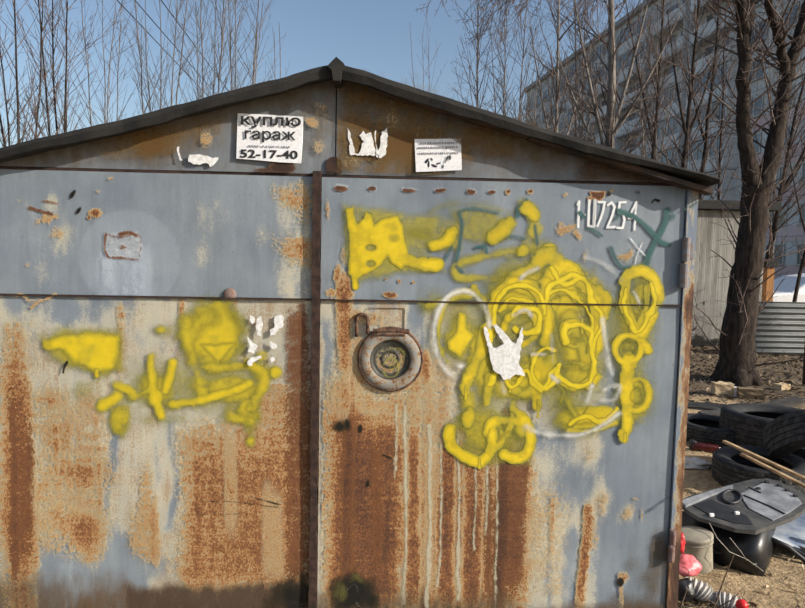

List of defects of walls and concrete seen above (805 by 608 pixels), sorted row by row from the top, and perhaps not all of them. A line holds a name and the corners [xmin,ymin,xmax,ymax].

corrosion [254,162,295,173]
corrosion [268,234,313,271]
corrosion [273,179,313,225]
corrosion [0,321,119,608]
water stain [2,574,309,608]
corrosion [127,301,311,591]
water stain [319,404,511,608]
corrosion [321,247,572,608]
corrosion [575,494,607,608]